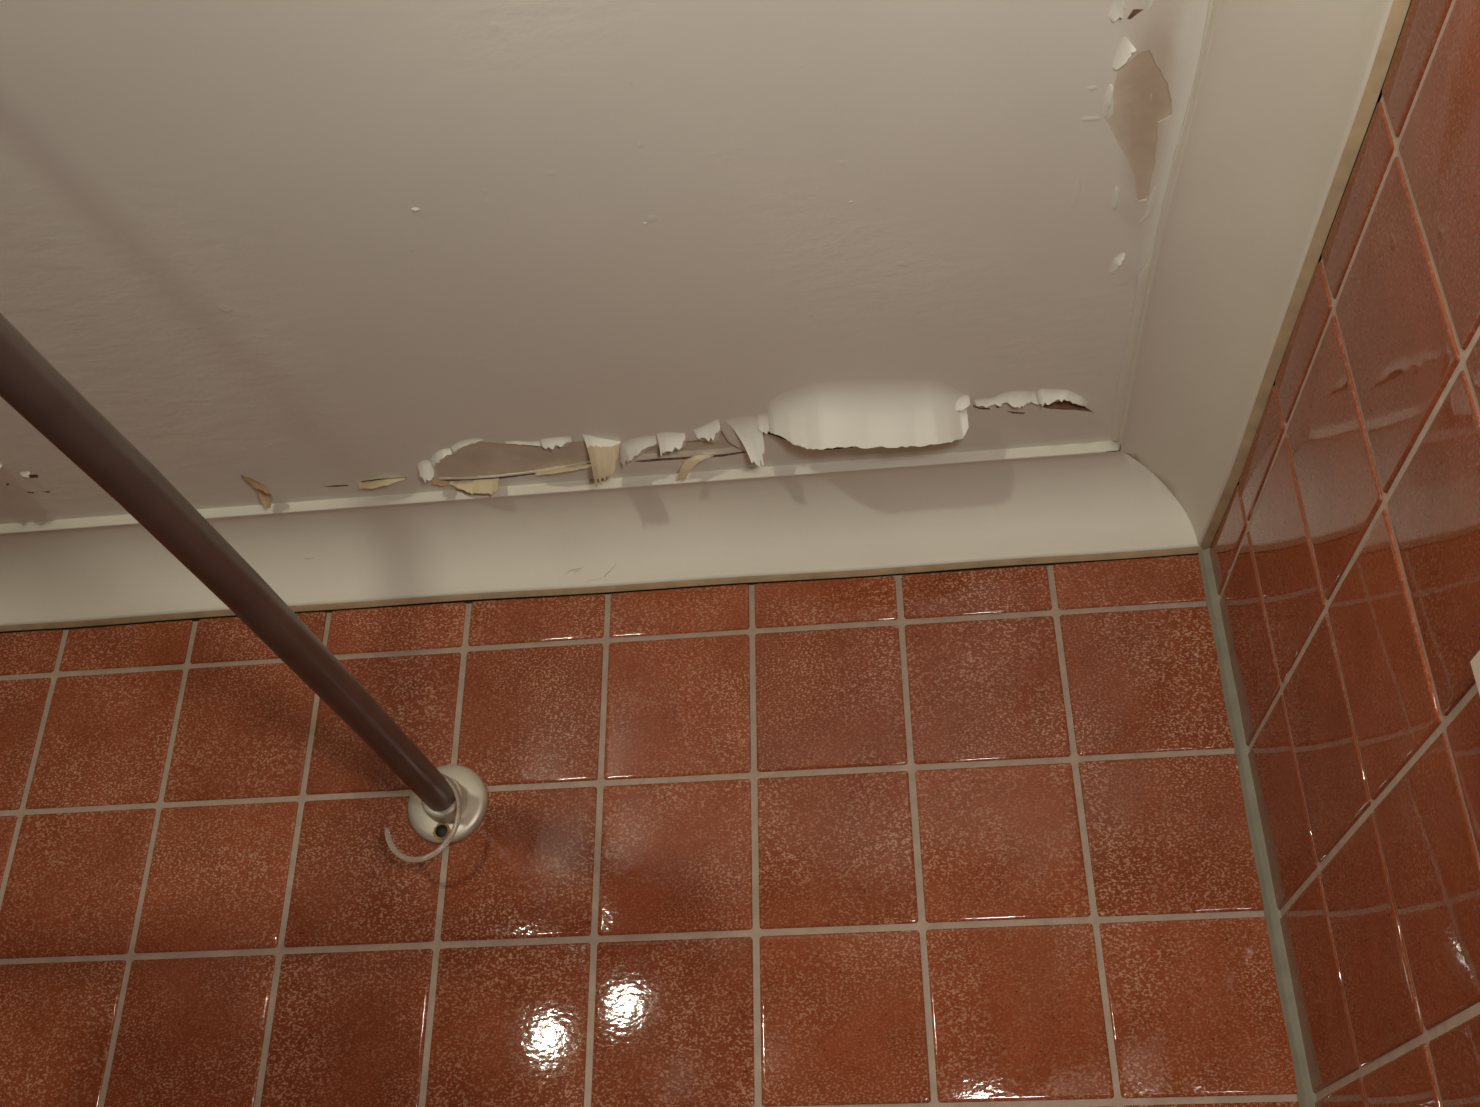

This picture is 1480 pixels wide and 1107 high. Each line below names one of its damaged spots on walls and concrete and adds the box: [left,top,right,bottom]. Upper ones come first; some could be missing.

peeling [1103,0,1172,210]
peeling [417,379,1094,487]
peeling [241,474,273,509]